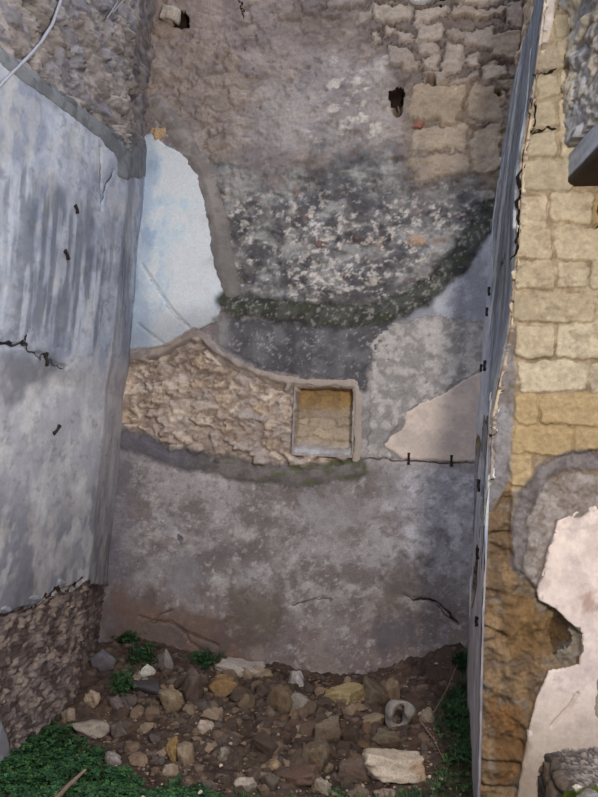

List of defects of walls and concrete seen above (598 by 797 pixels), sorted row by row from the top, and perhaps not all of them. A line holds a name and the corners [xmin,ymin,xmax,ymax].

spalling [388,87,405,113]
crack [503,100,557,260]
crack [0,334,64,369]
flaking render [120,94,495,542]
flaking render [0,577,108,754]
crack [405,595,458,624]
flaking render [469,392,598,797]